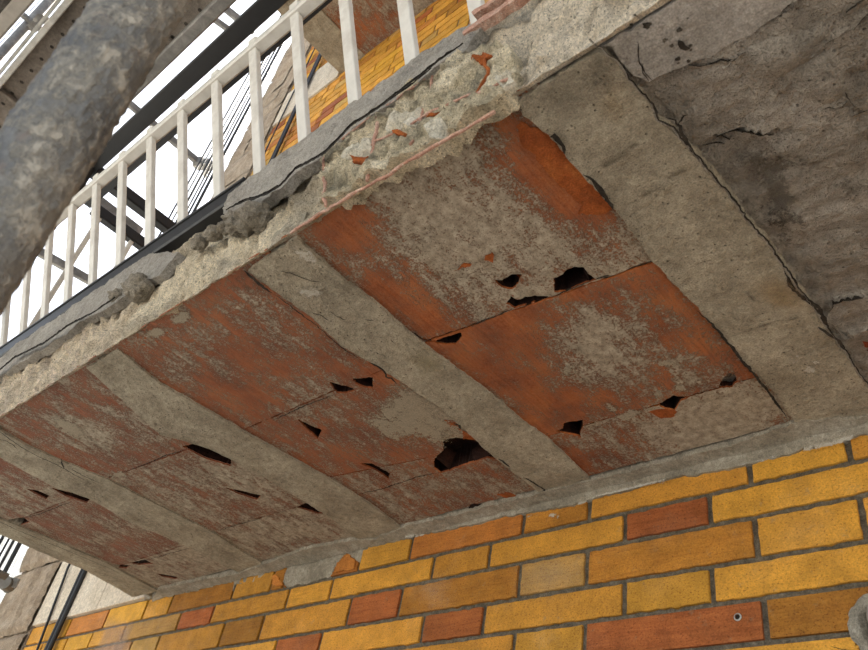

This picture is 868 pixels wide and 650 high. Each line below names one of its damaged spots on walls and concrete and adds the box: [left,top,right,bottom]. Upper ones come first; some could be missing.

spalling [290,40,611,234]
crack [550,133,566,154]
crack [584,175,614,209]
crack [589,36,868,387]
crack [0,296,116,370]
crack [699,312,788,419]
peeling [444,420,491,461]